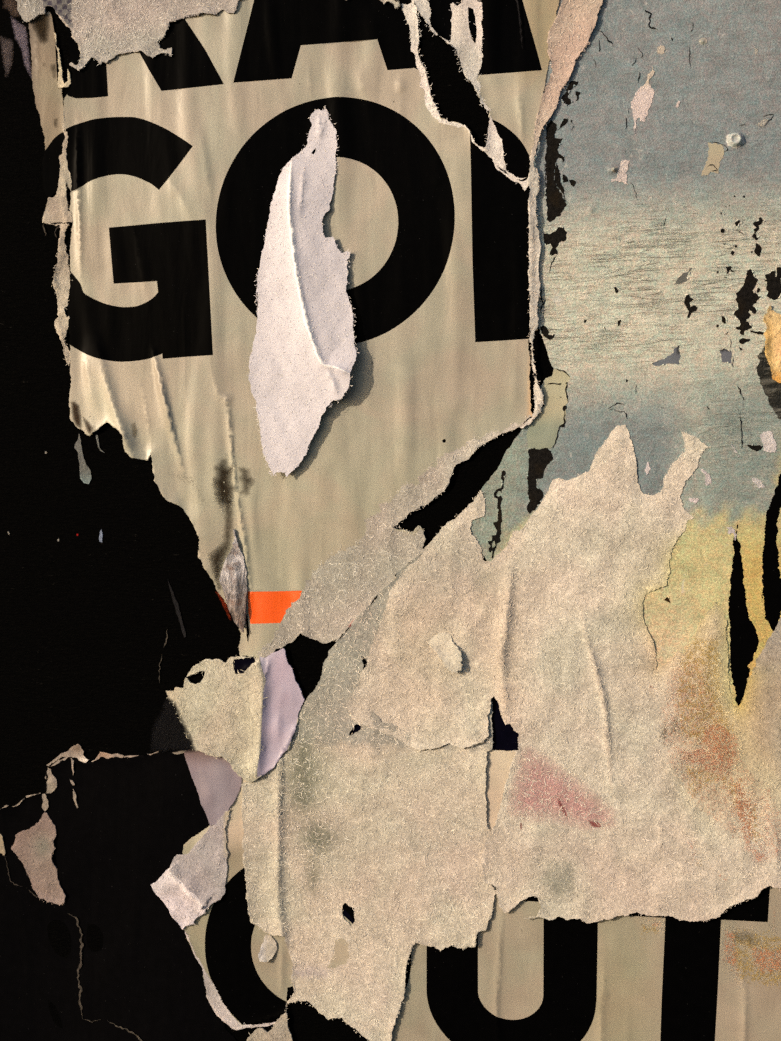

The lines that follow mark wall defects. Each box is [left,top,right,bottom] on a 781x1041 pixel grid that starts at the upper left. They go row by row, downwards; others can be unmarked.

peeling [543,81,581,256]
peeling [716,217,781,366]
peeling [486,470,506,559]
spalling [527,368,570,513]